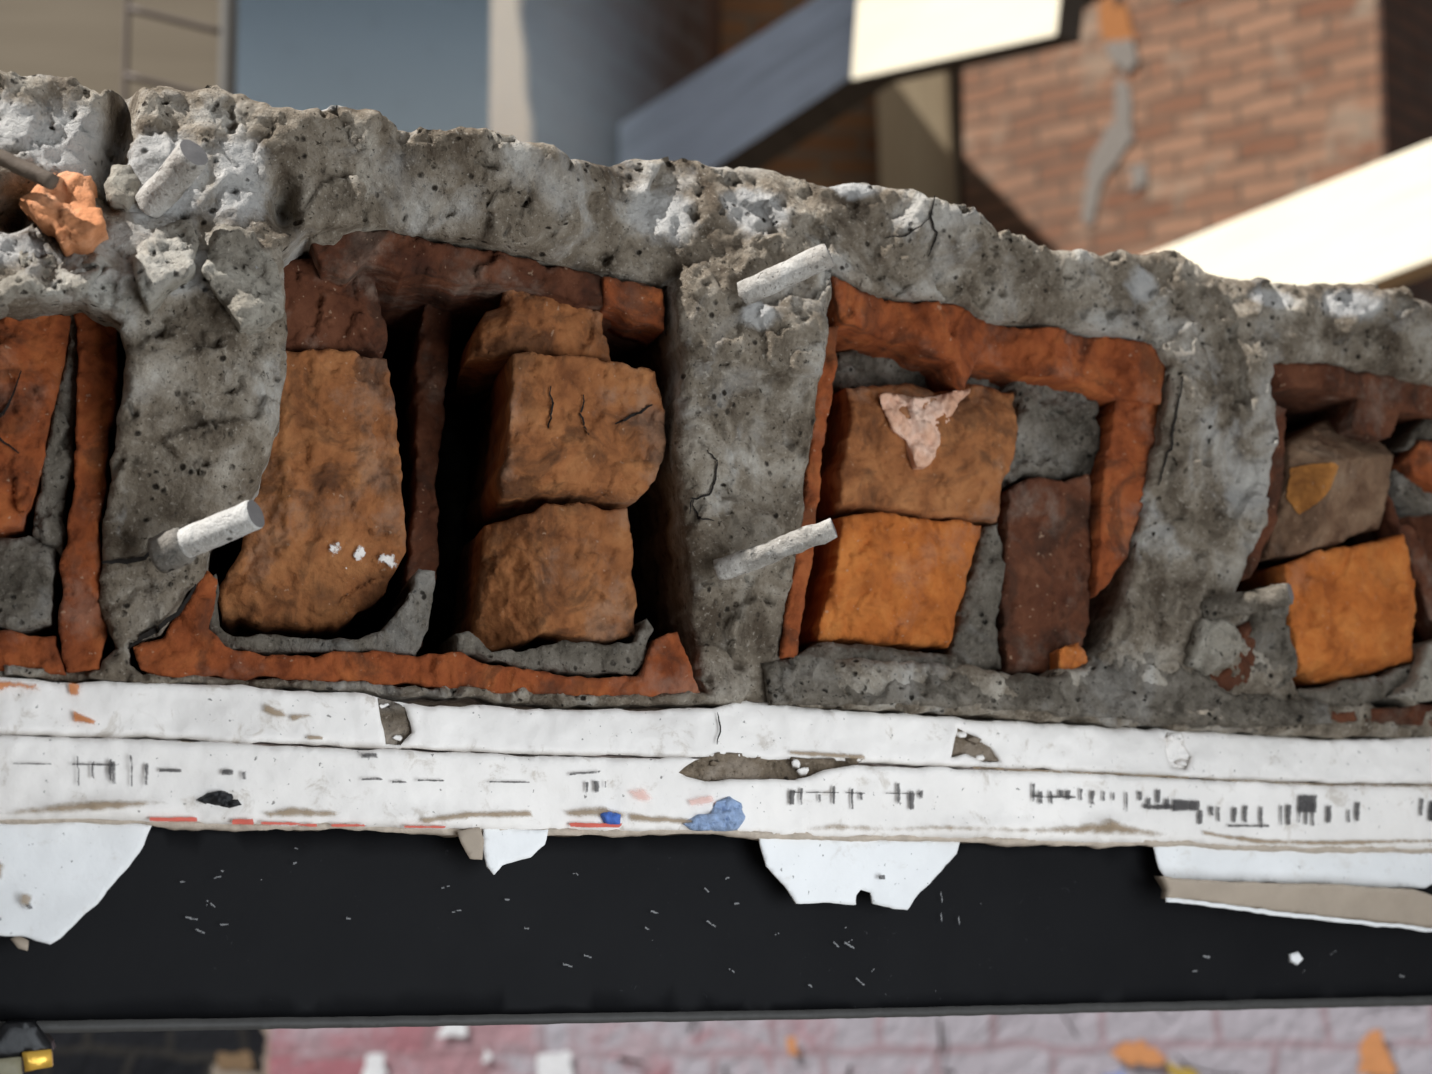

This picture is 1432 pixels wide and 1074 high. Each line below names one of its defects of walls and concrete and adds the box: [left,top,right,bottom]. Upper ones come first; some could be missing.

spalling [0,315,71,538]
spalling [218,258,406,640]
spalling [444,290,666,652]
spalling [798,383,1092,675]
spalling [1235,418,1432,688]
peeling [0,822,152,951]
spalling [679,752,863,781]
peeling [759,839,960,910]
peeling [1153,846,1432,932]
peeling [212,1029,270,1074]